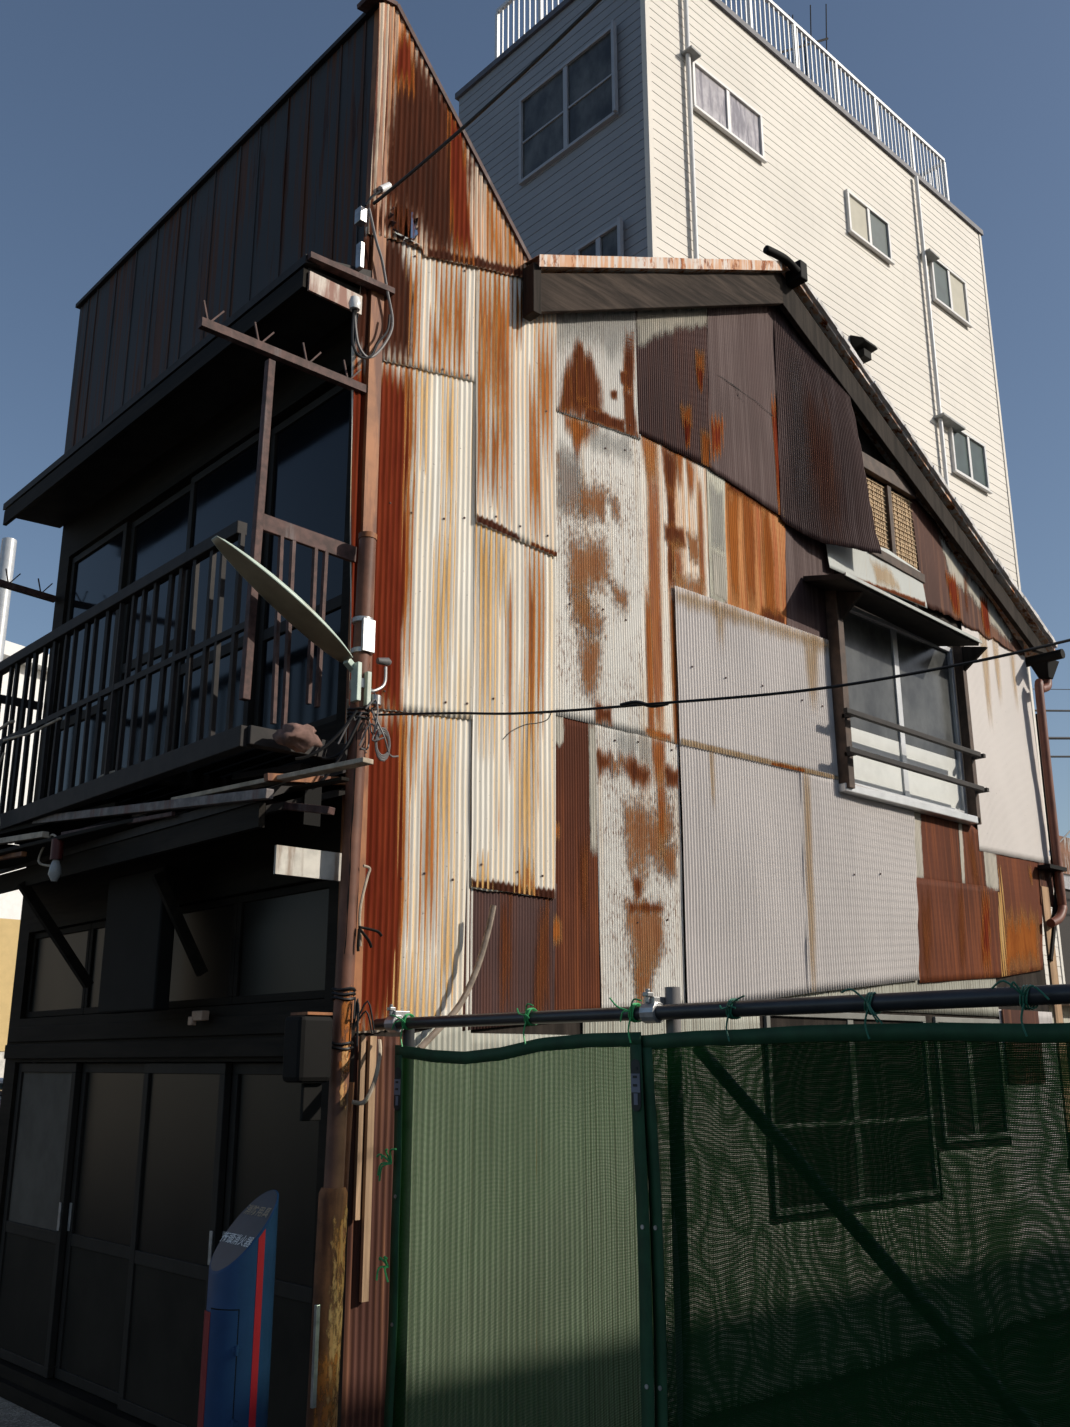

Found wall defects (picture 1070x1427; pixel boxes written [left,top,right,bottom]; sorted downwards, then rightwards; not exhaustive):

rust [350,26,839,1031]
rust [959,867,1040,977]